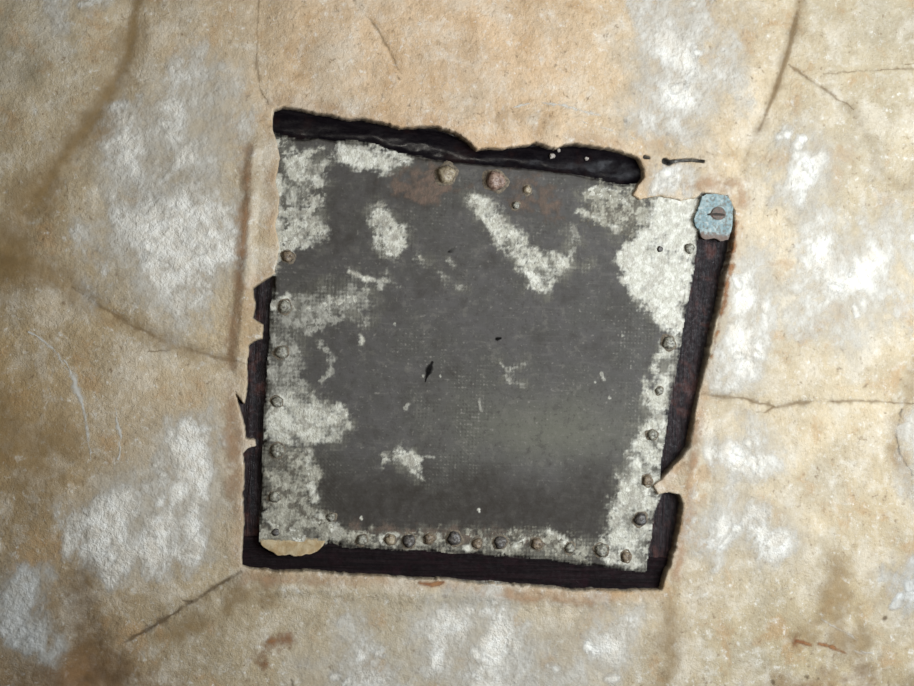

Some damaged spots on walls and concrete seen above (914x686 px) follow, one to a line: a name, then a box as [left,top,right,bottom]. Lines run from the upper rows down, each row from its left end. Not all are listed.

water stain [101,45,245,325]
peeling [275,138,413,269]
water stain [650,163,693,196]
water stain [772,126,828,206]
water stain [710,205,914,393]
peeling [259,180,699,571]
water stain [60,408,225,591]
water stain [686,488,796,571]
water stain [704,427,783,481]
water stain [0,565,65,662]
crack [134,578,230,636]
water stain [416,580,536,686]